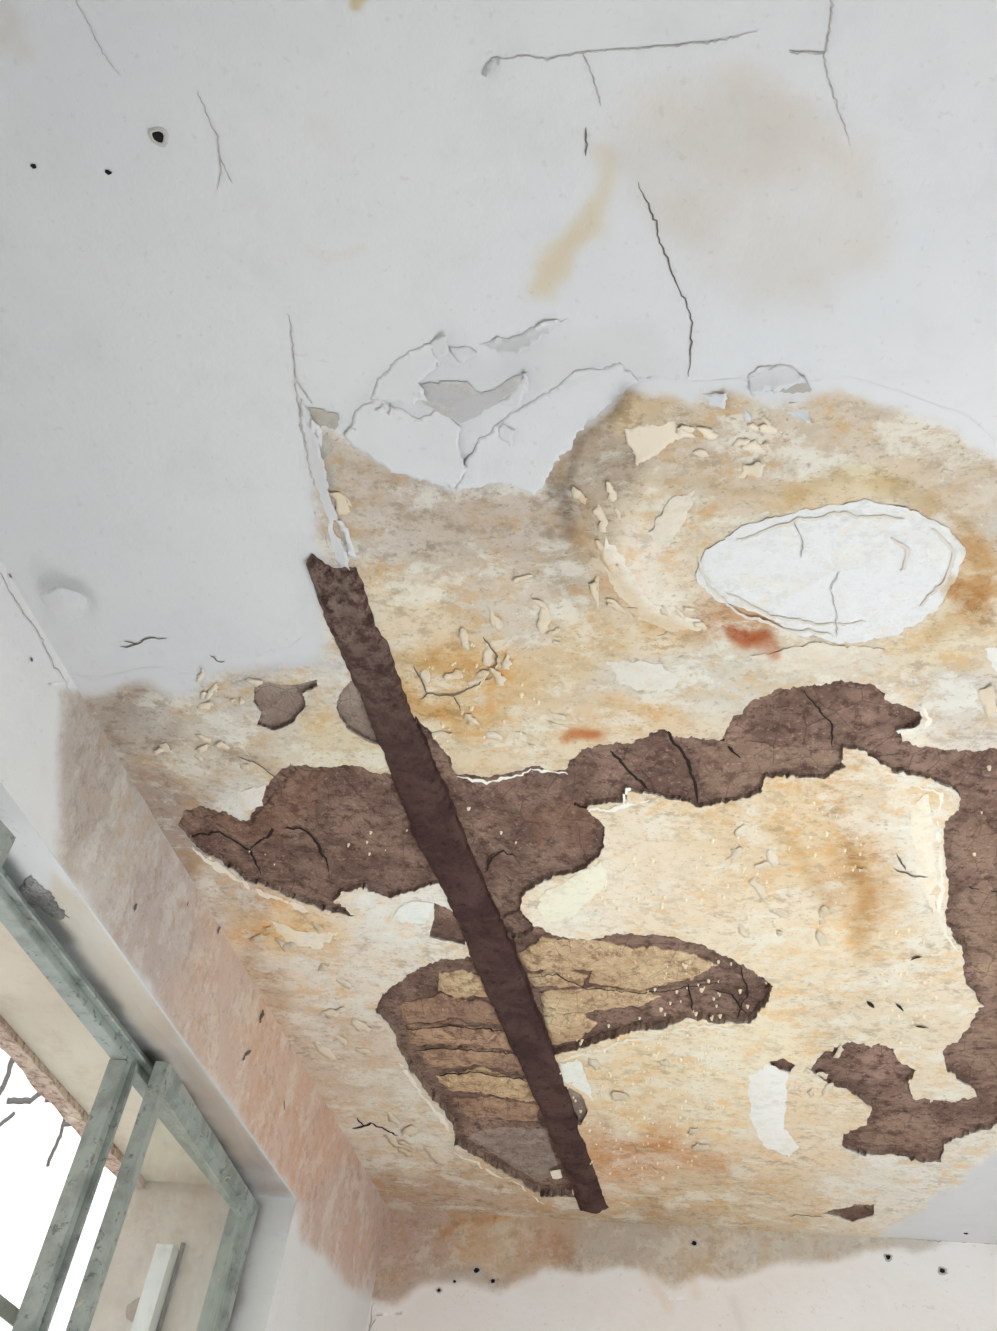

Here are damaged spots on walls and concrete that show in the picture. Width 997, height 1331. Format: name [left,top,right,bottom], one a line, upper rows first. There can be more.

crack [76,0,121,76]
crack [197,91,233,190]
crack [494,32,752,156]
crack [790,0,850,145]
crack [638,183,693,377]
peeling [299,319,638,570]
corrosion [306,558,374,645]
peeling [696,498,966,644]
spalling [196,668,317,729]
water stain [24,377,997,1316]
spalling [178,764,574,1205]
spalling [416,680,997,1162]